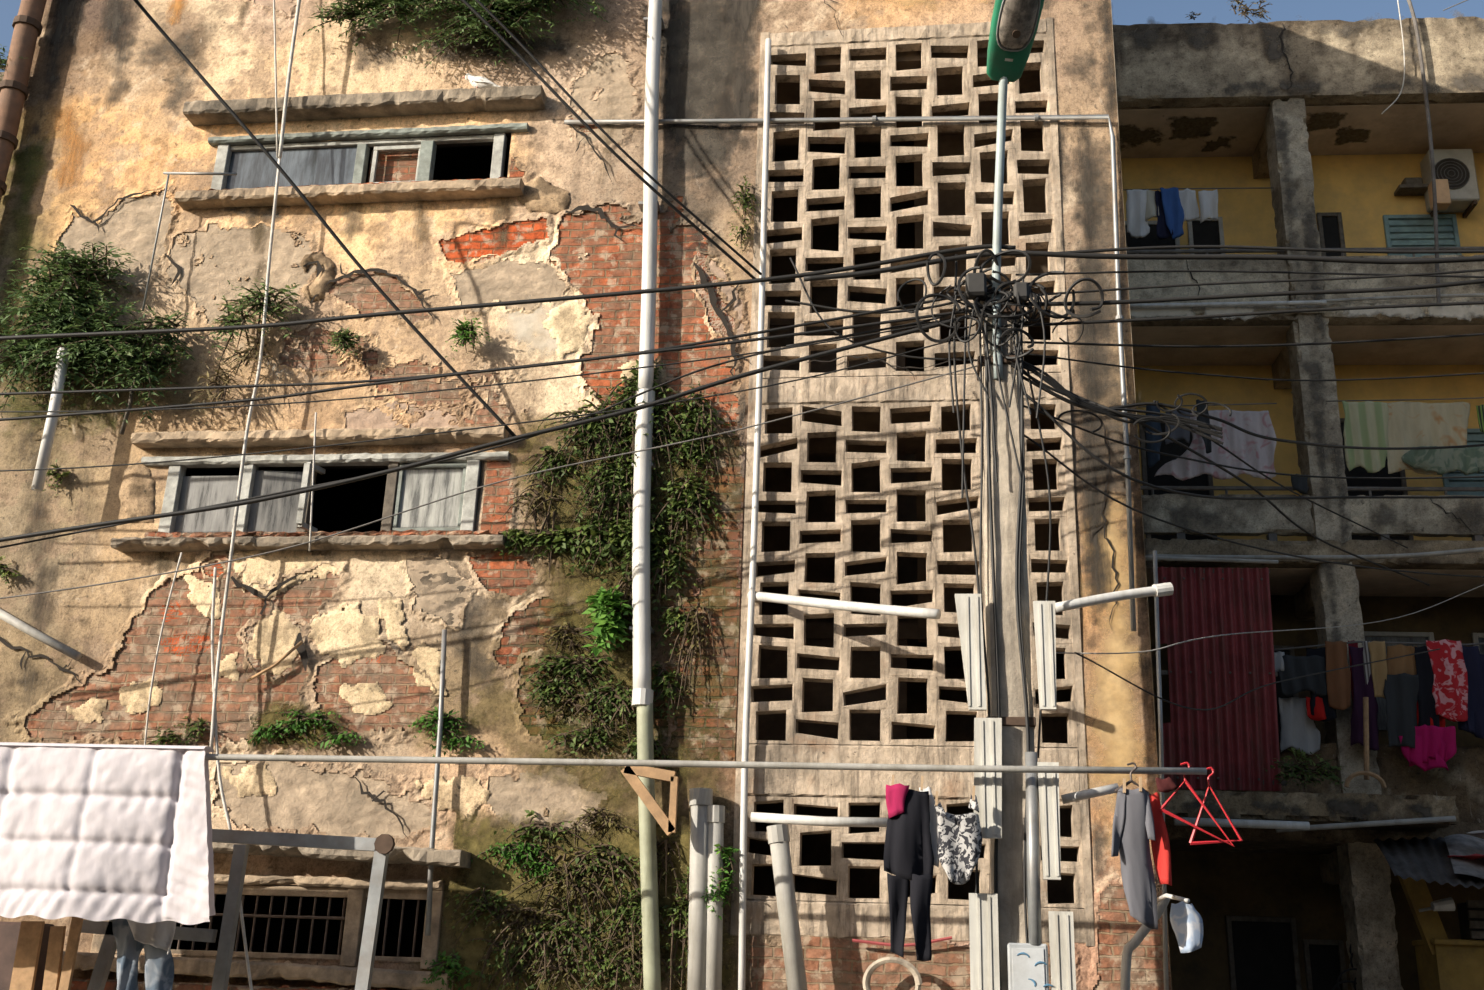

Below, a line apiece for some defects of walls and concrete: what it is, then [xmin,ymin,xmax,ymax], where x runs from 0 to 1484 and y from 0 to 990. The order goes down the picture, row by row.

leakage [642,0,760,187]
leakage [1072,0,1165,119]
crack [1279,23,1294,93]
leakage [1405,25,1420,64]
leakage [1374,72,1484,93]
peeling [1119,116,1236,152]
peeling [1306,112,1370,145]
spalling [2,179,751,847]
crack [355,777,408,838]